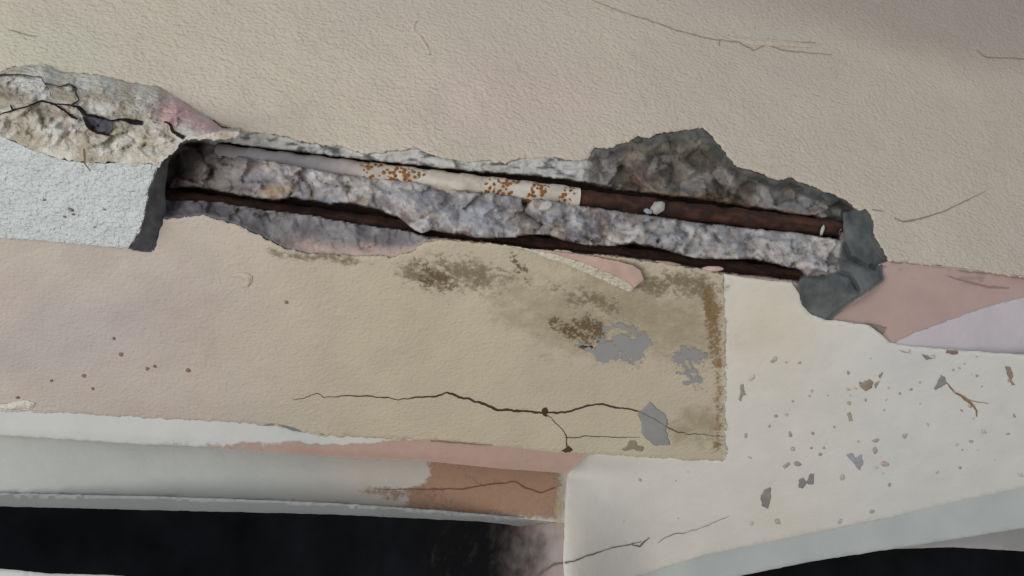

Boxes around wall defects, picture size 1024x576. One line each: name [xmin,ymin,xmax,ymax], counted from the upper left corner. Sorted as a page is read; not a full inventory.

crack [0,73,86,120]
crack [112,118,185,139]
corrosion [360,161,426,182]
corrosion [481,176,578,204]
leakage [404,255,528,295]
spalling [162,128,1024,421]
leakage [636,274,711,294]
leakage [548,293,613,346]
crack [296,392,723,448]
peeling [621,401,670,451]
flaking render [783,447,814,489]
flaking render [760,487,771,509]